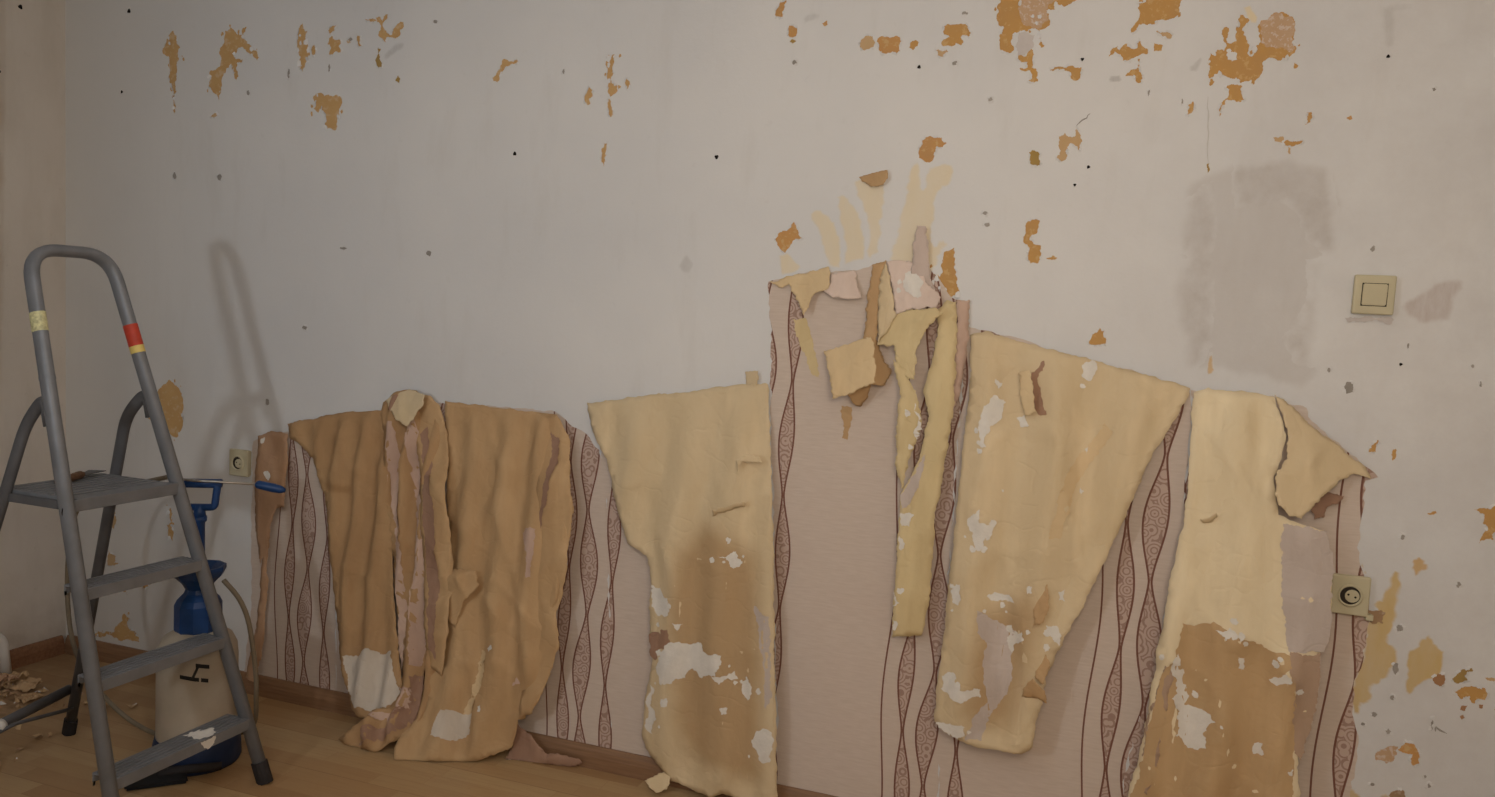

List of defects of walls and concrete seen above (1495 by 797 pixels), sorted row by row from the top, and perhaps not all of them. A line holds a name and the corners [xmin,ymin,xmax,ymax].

peeling [207,25,259,119]
peeling [286,14,404,83]
peeling [858,9,973,68]
peeling [994,0,1083,84]
peeling [1109,0,1181,98]
peeling [1207,12,1300,115]
peeling [310,93,343,131]
peeling [917,135,946,162]
peeling [774,222,804,254]
peeling [1023,216,1057,263]
peeling [930,248,961,299]
peeling [1474,503,1495,543]